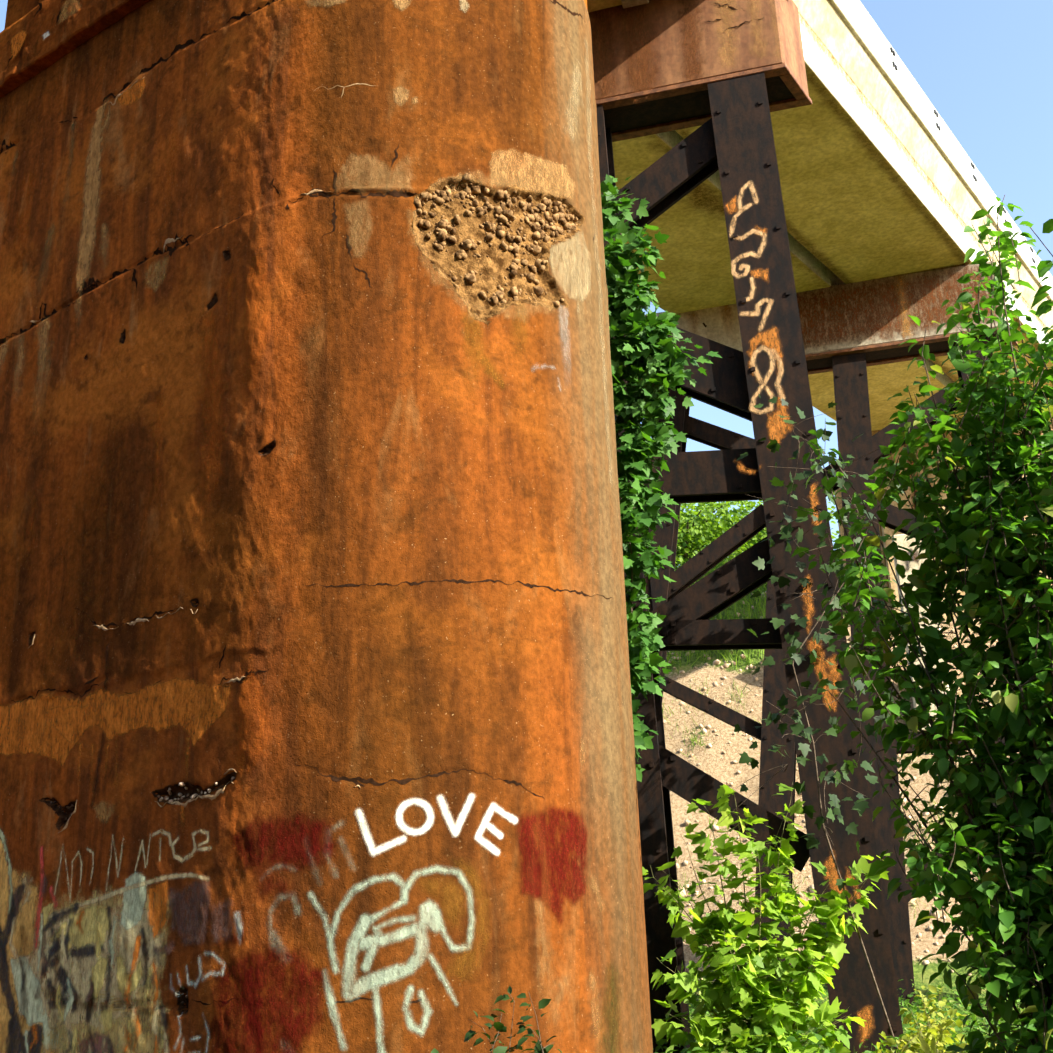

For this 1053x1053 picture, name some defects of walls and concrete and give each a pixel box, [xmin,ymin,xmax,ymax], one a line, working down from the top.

crack [35,0,63,24]
crack [102,0,277,105]
crack [0,139,17,154]
crack [272,143,417,287]
spalling [412,149,590,326]
crack [0,213,244,347]
crack [305,579,612,599]
crack [11,676,160,703]
crack [215,645,269,688]
peeling [0,678,230,770]
spalling [151,768,237,814]
spalling [39,797,77,833]